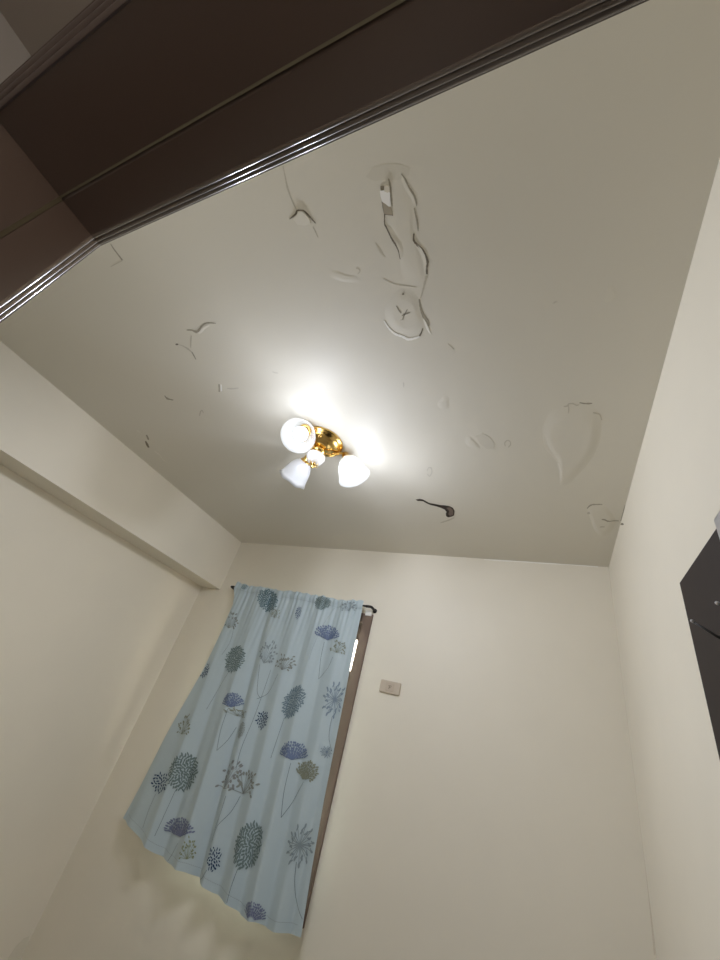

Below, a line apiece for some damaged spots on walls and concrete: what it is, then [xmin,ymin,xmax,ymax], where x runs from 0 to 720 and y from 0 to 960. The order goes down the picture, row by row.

peeling [380,186,427,272]